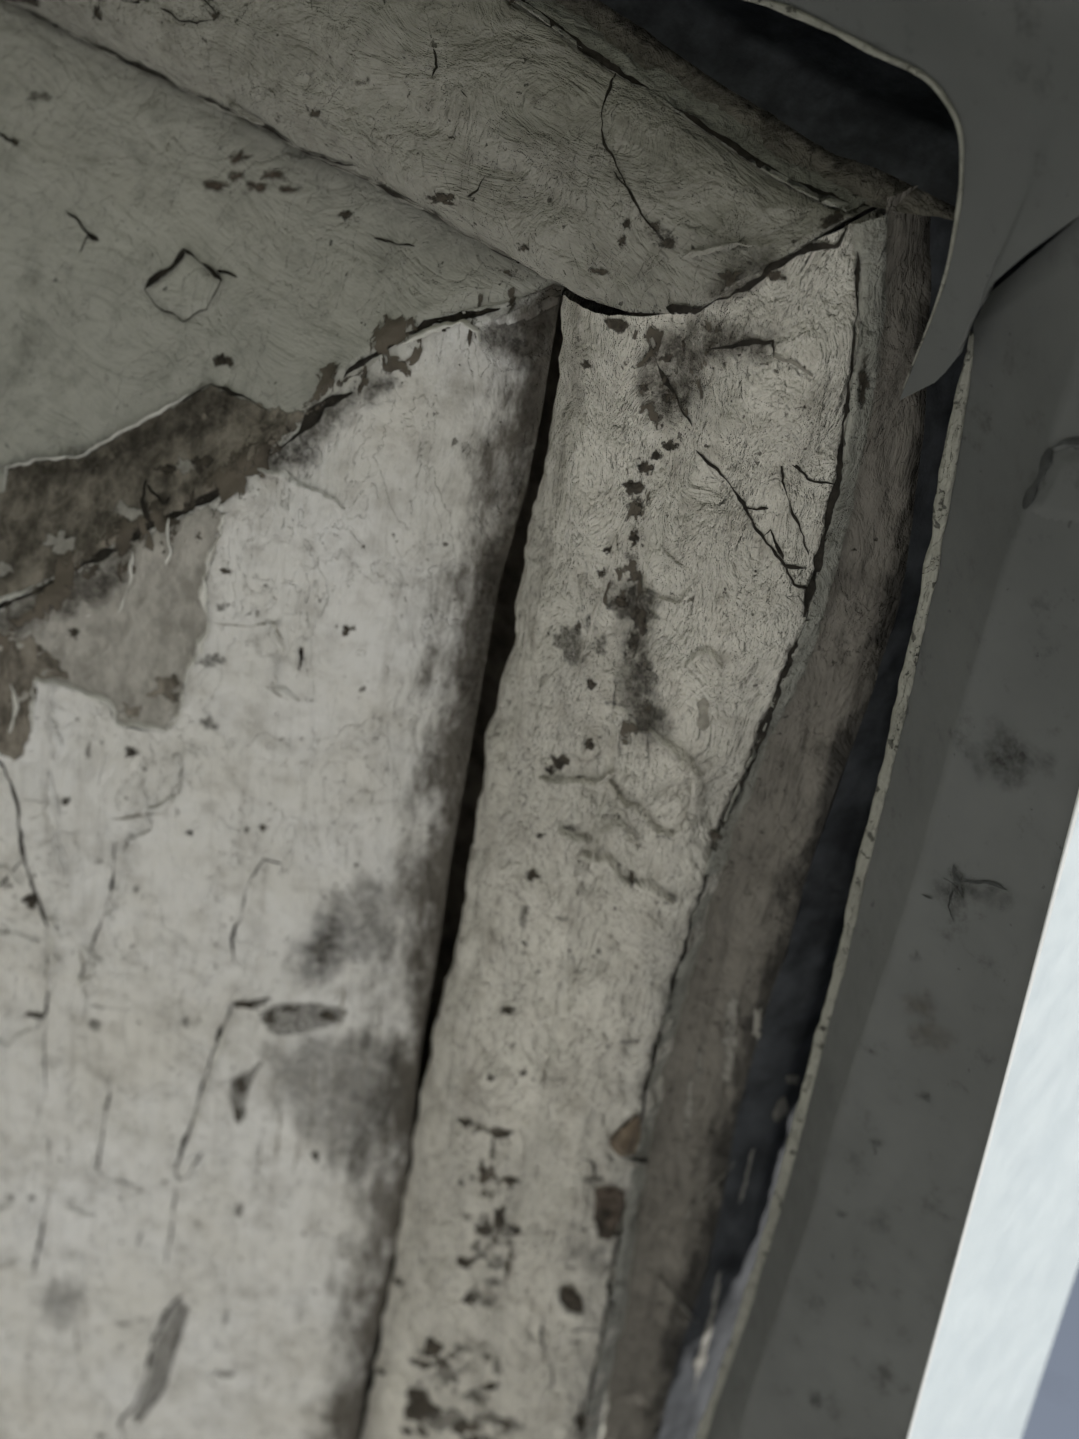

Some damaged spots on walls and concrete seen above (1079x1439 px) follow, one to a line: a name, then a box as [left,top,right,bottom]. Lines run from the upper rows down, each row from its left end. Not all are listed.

peeling [0,383,346,882]
peeling [213,353,234,368]
peeling [203,151,298,192]
crack [0,0,547,653]
crack [509,0,870,1128]
crack [539,1199,626,1439]